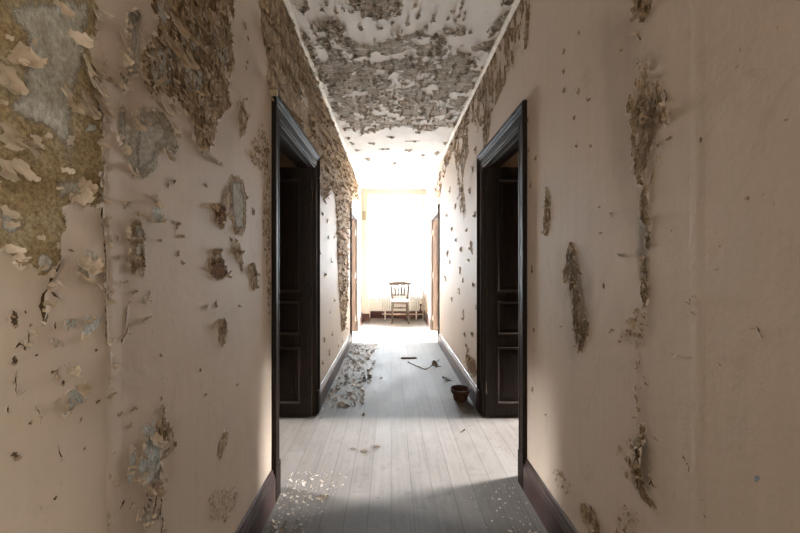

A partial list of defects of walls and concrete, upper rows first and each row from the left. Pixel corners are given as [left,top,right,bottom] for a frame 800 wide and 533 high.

peeling [0,0,272,326]
peeling [118,395,177,499]
peeling [258,0,532,364]
peeling [559,241,591,354]
peeling [609,59,672,510]